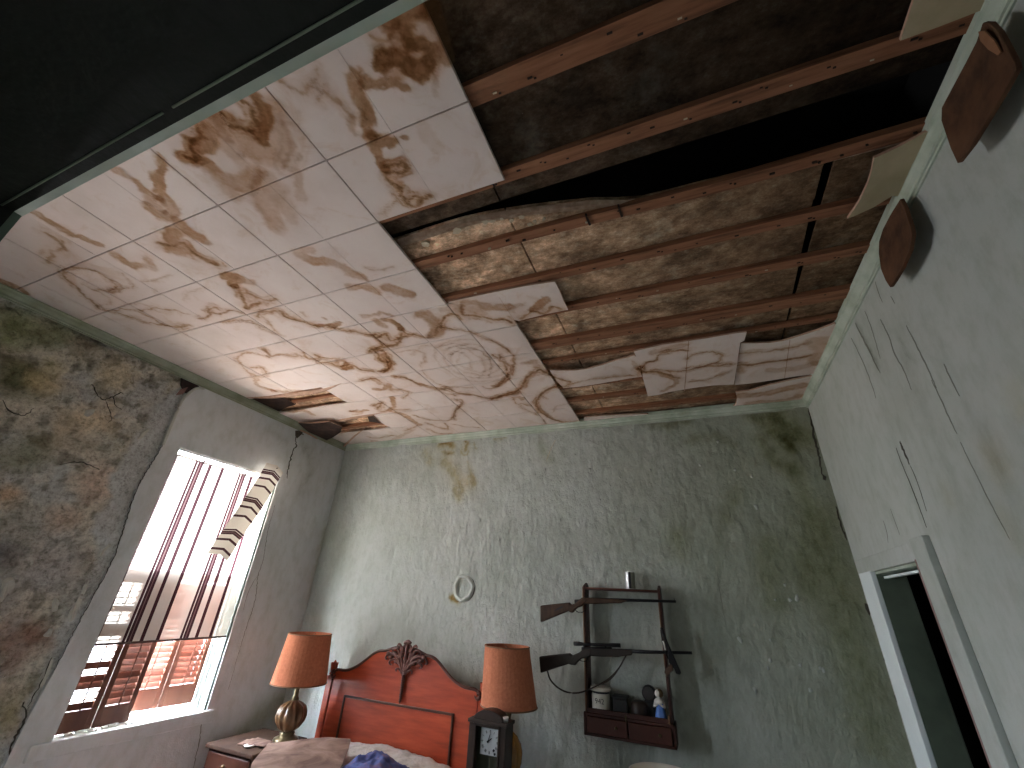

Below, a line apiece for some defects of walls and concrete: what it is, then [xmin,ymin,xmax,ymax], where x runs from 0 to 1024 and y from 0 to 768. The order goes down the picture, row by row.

water stain [374,19,433,83]
water stain [185,132,200,163]
water stain [384,161,431,207]
water stain [366,324,422,385]
crack [91,384,123,422]
water stain [445,361,569,422]
crack [851,282,1010,539]
crack [287,430,304,477]
crack [808,409,826,481]
crack [835,506,847,540]